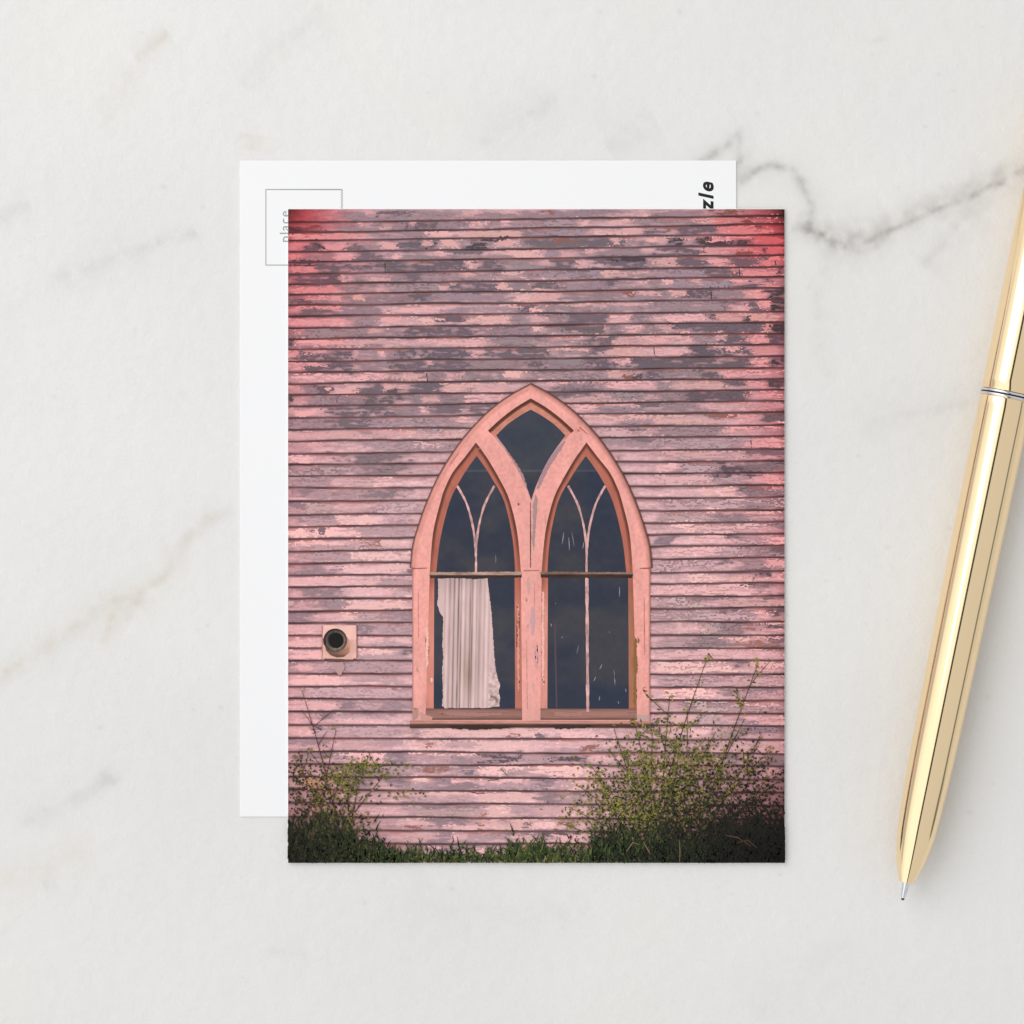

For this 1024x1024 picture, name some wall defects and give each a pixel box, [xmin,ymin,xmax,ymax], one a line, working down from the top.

peeling [288,209,785,693]